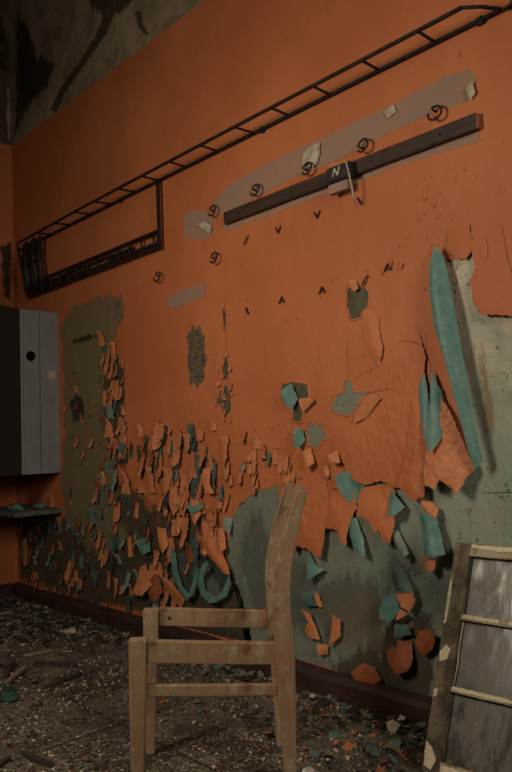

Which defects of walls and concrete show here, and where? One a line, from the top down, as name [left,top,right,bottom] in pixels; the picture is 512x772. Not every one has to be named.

damp [0,11,53,134]
damp [51,0,132,111]
peeling [17,207,512,697]